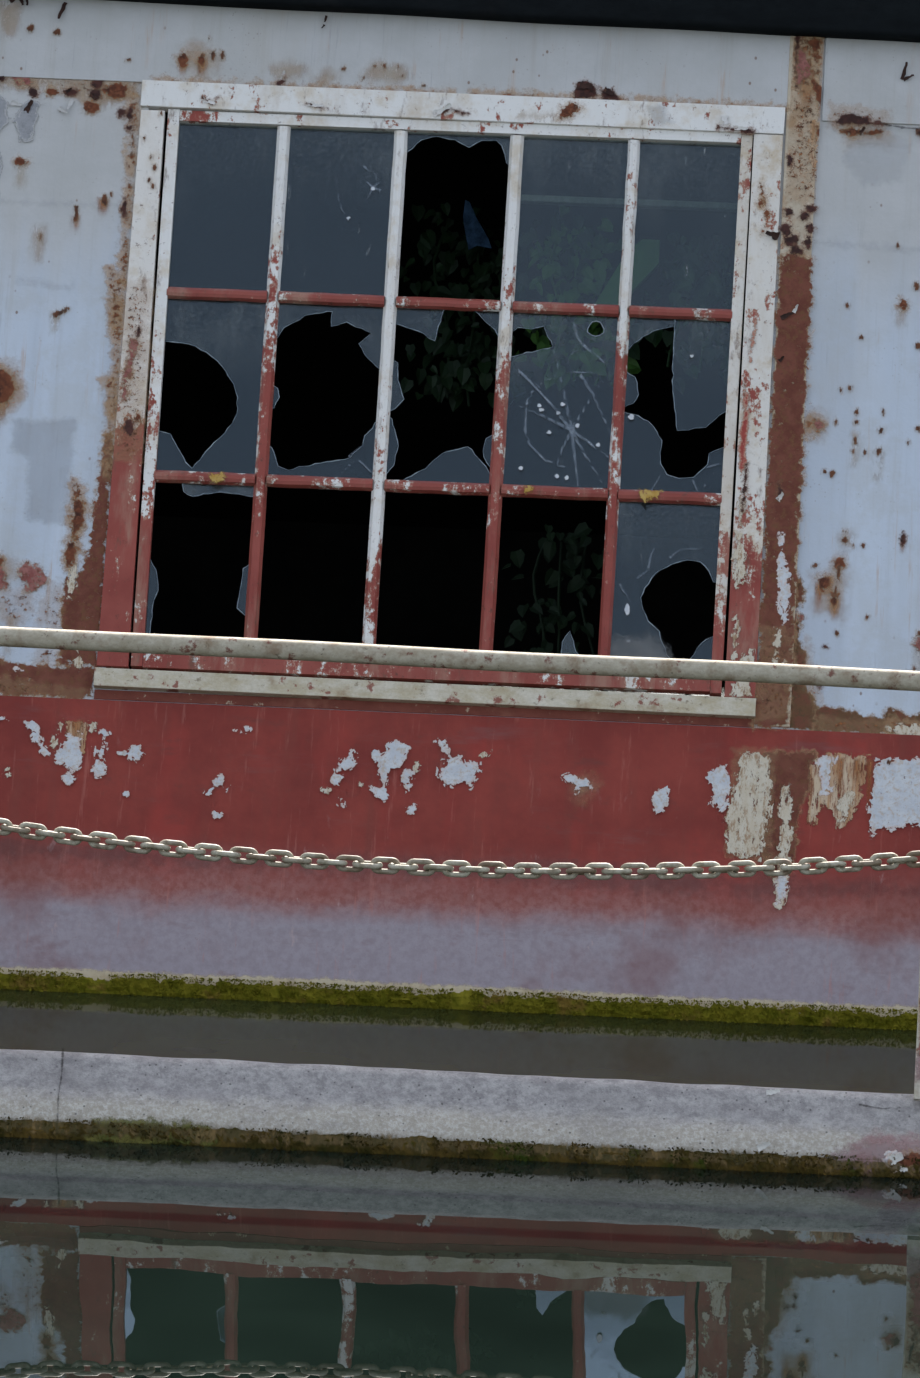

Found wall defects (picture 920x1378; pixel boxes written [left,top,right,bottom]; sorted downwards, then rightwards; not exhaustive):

rust [158,37,225,83]
rust [276,63,438,93]
peeling [0,95,40,142]
rust [727,36,920,256]
rust [0,76,140,476]
rust [896,281,920,310]
rust [806,416,838,433]
rust [851,409,885,456]
rust [812,530,865,613]
peeling [0,716,146,786]
peeling [320,738,491,815]
peeling [705,750,920,910]